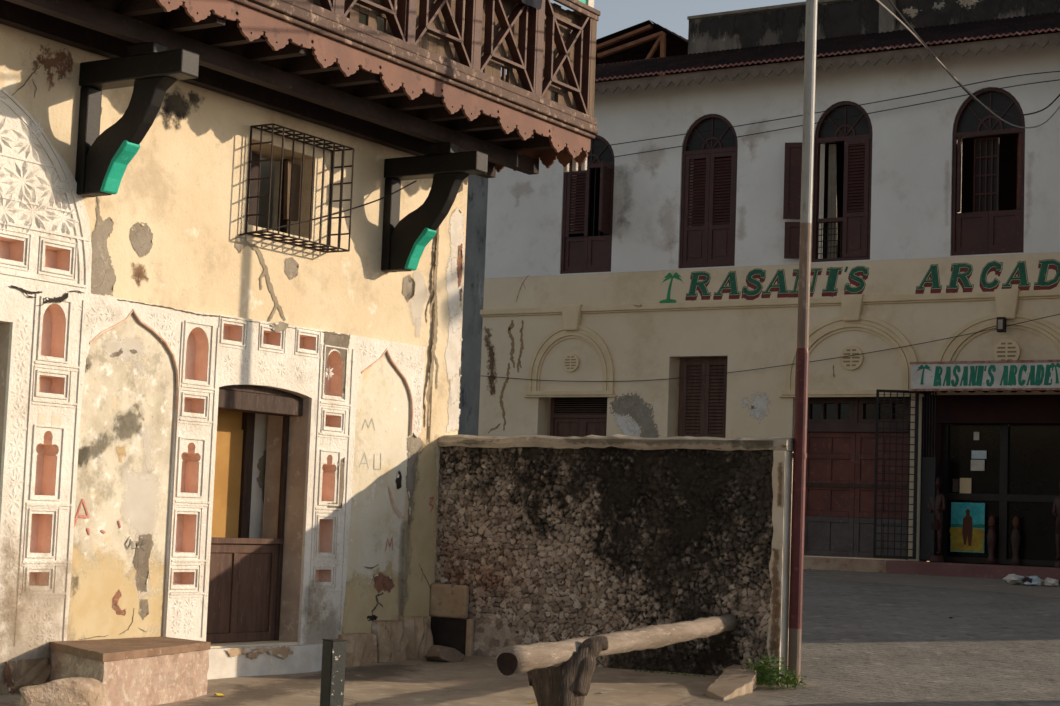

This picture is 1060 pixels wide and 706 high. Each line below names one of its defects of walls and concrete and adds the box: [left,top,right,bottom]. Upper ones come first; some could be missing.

spalling [902,0,978,18]
spalling [34,46,73,87]
peeling [91,200,116,296]
peeling [130,222,153,257]
crack [117,238,341,336]
peeling [444,207,464,433]
crack [488,276,528,434]
peeling [610,392,659,438]
spalling [112,589,126,616]
peeling [133,533,154,619]
spalling [373,572,394,593]